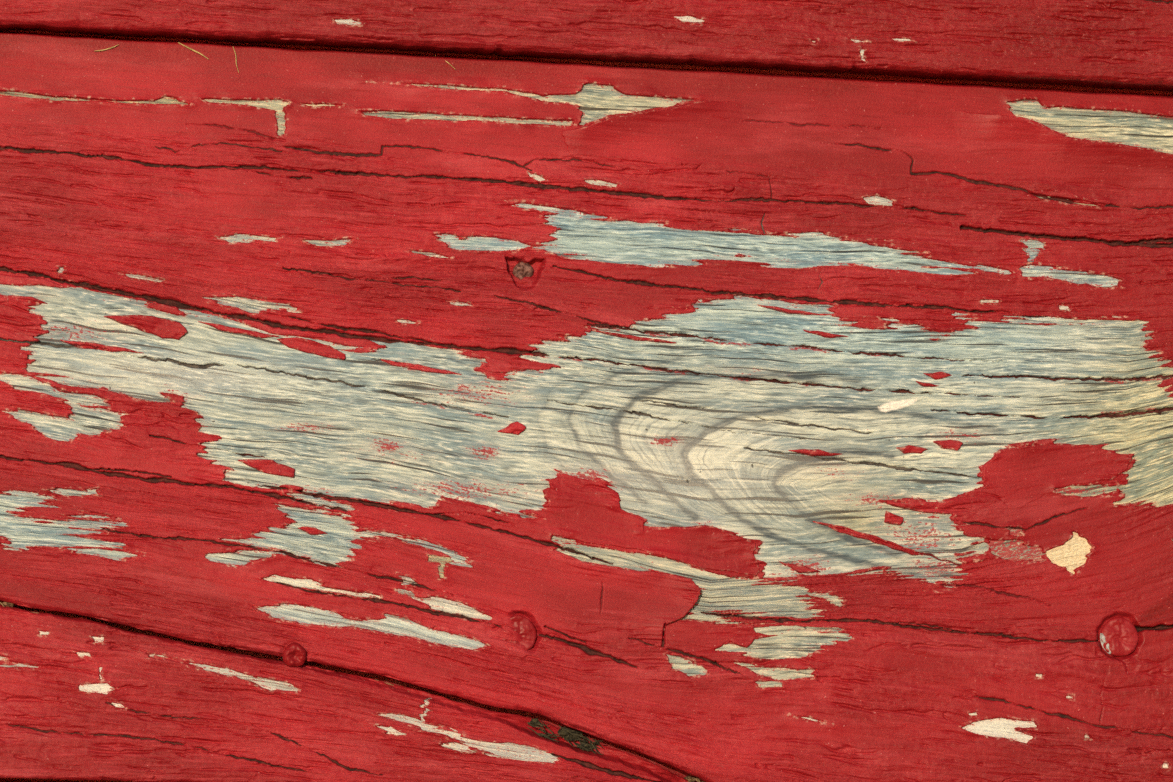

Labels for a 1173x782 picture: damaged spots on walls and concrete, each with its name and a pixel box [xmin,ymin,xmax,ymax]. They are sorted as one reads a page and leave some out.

crack [0,124,874,234]
crack [746,120,1075,204]
peeling [953,100,1173,206]
peeling [411,204,1119,287]
crack [903,207,1173,248]
peeling [0,284,1173,691]
crack [539,626,741,674]
peeling [79,667,124,708]
crack [9,702,383,776]
peeling [377,698,559,763]
crack [551,753,658,782]
peeling [962,713,1036,743]